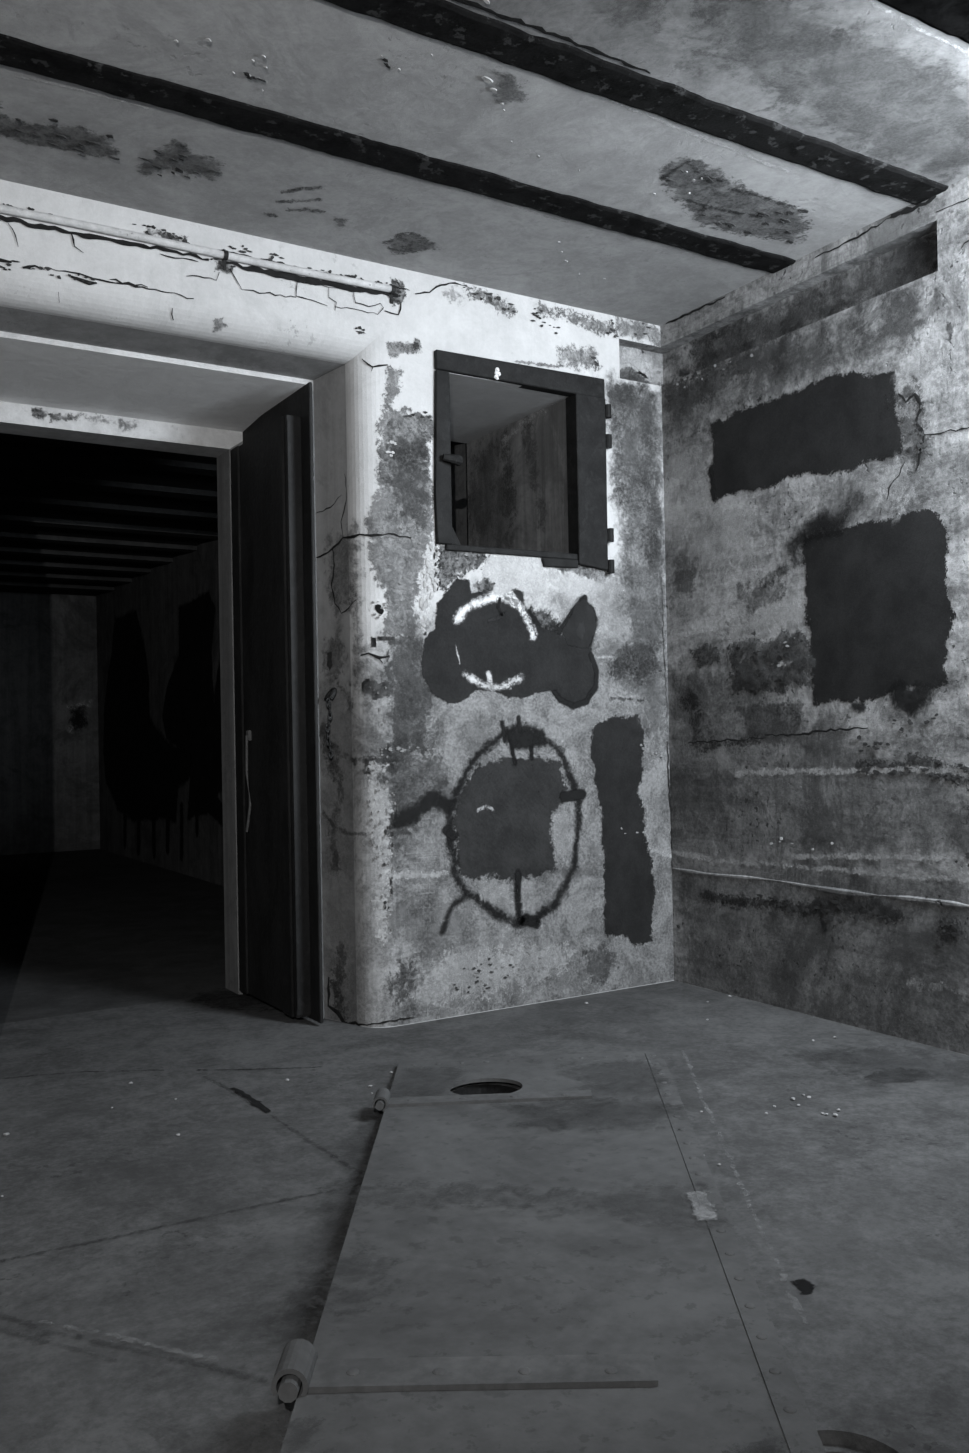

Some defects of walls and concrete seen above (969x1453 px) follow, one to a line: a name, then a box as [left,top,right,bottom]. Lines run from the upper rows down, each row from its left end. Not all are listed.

crack [0,215,410,320]
peeling [382,232,436,255]
water stain [608,235,953,593]
peeling [364,282,816,1026]
water stain [676,577,803,640]
water stain [599,641,969,1084]